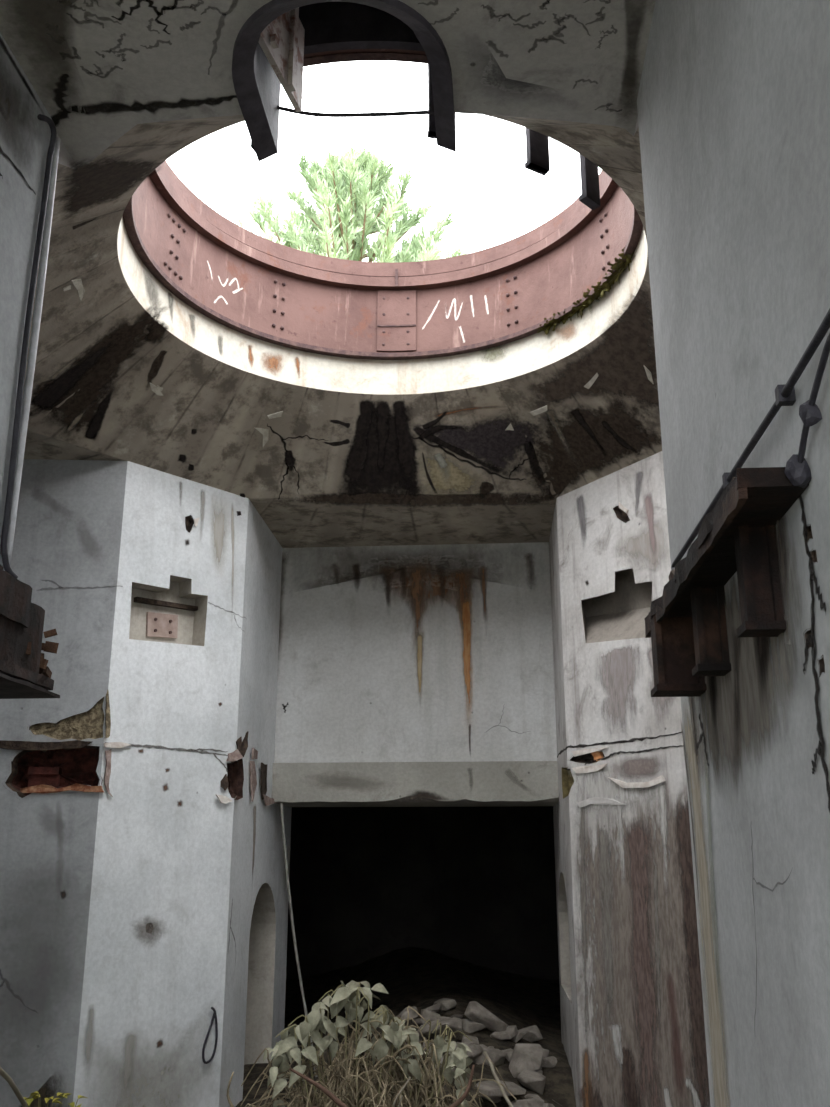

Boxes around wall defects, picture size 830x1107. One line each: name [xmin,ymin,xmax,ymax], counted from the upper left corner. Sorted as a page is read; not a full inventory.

crack [51,0,238,126]
crack [418,0,617,58]
crack [0,146,36,195]
damp [285,450,296,479]
damp [289,400,551,507]
damp [577,496,586,538]
damp [627,472,663,562]
rust [381,566,487,707]
crack [798,495,830,812]
spalling [0,690,143,797]
spalling [216,731,277,864]
damp [577,515,796,1107]